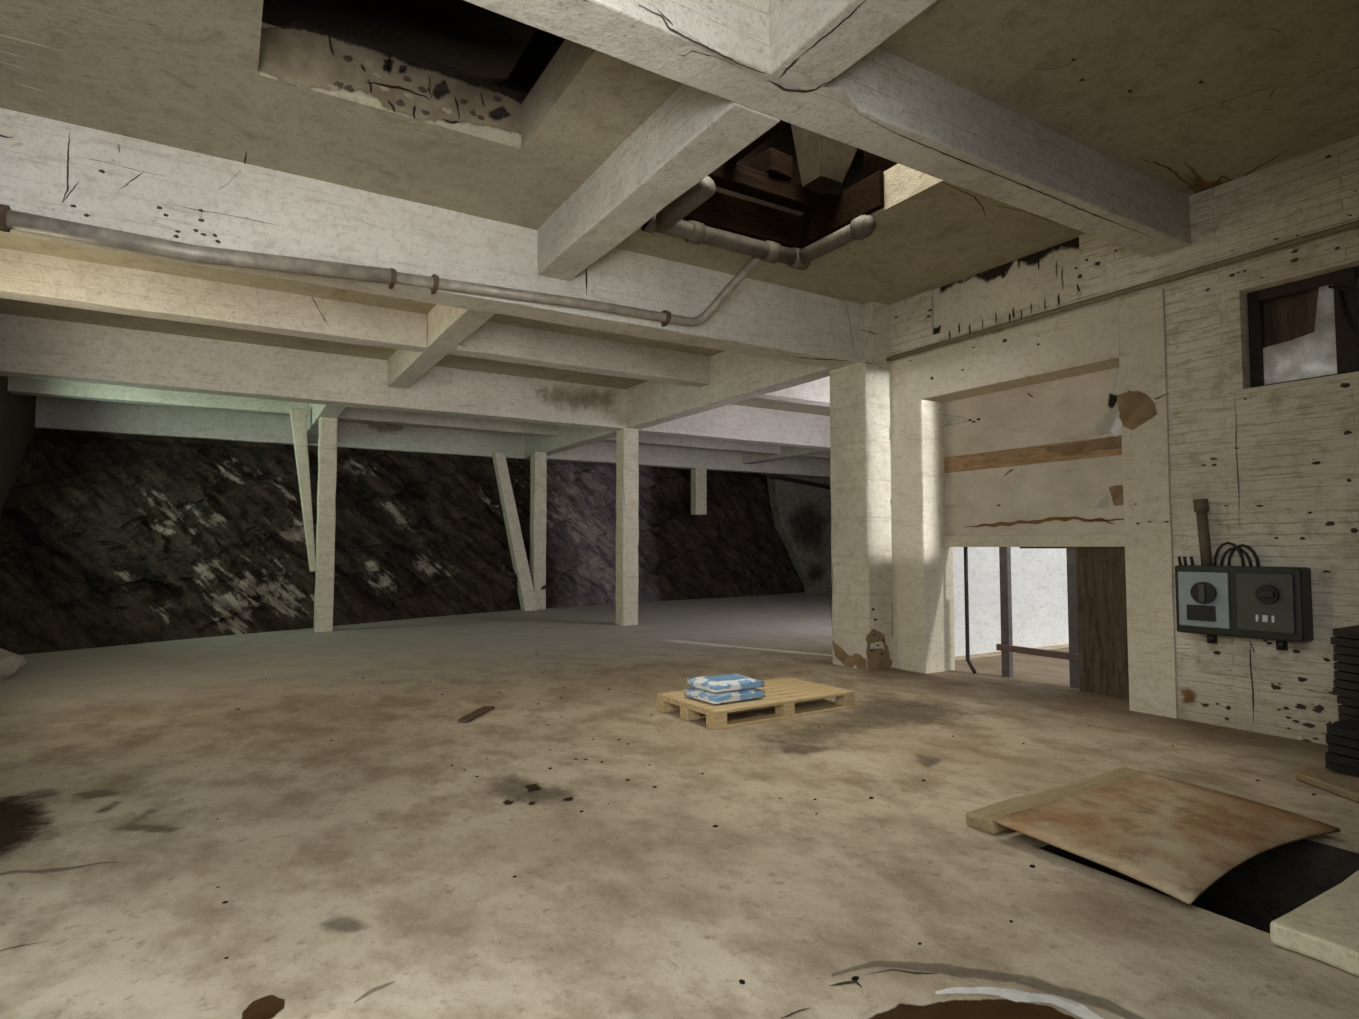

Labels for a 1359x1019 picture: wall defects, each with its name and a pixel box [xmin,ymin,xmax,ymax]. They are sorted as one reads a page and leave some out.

crack [639,0,867,74]
peeling [258,19,529,134]
spalling [940,237,1100,292]
spalling [1094,367,1169,436]
damp [0,790,55,856]
damp [79,791,119,812]
damp [121,810,174,831]
damp [0,862,118,875]
crack [781,969,933,1018]
damp [832,961,1143,1019]